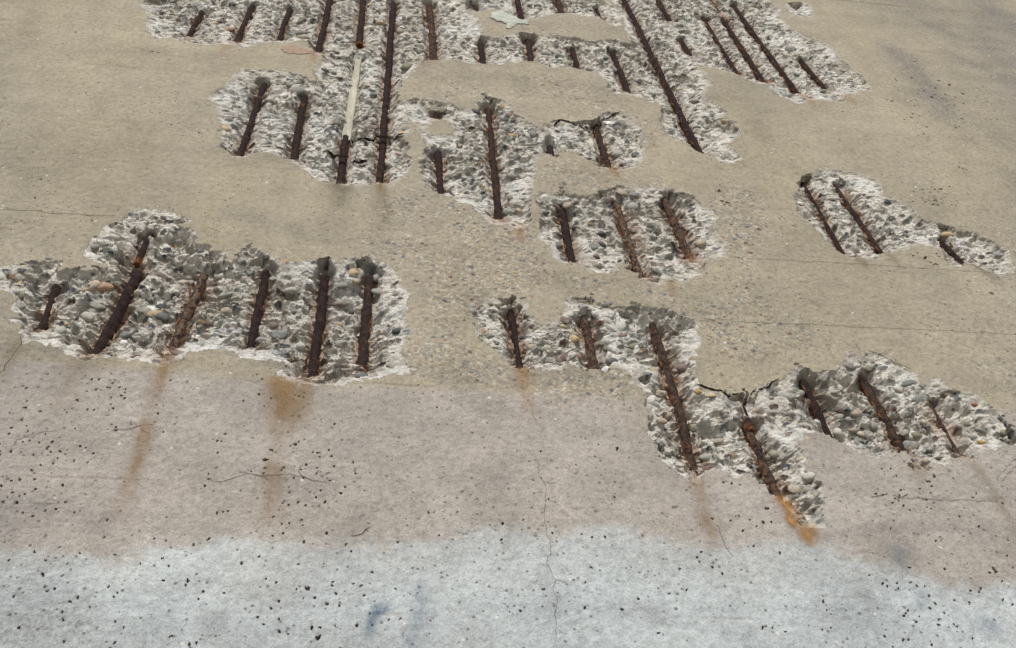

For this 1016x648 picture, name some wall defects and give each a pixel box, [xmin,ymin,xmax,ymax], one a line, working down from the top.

spalling [793,168,1015,277]
spalling [0,206,413,404]
spalling [0,387,95,517]
crack [698,378,779,405]
spalling [469,293,1016,528]